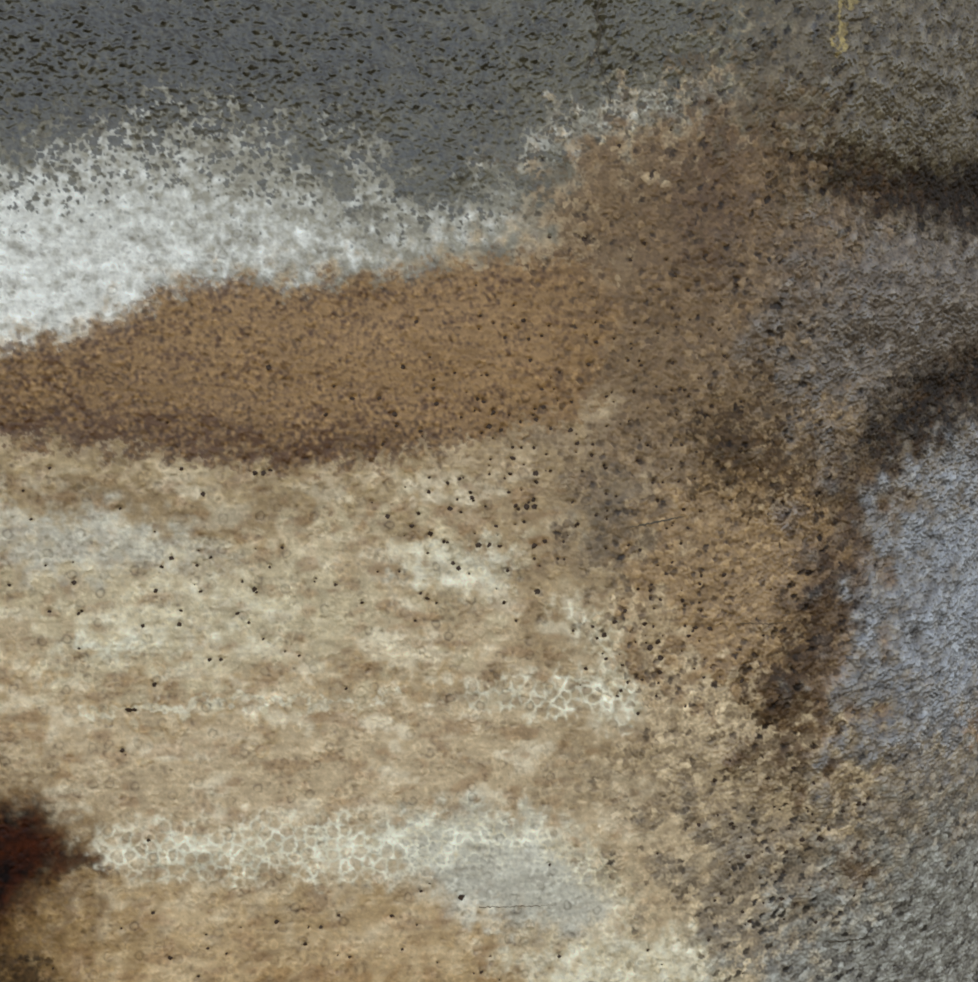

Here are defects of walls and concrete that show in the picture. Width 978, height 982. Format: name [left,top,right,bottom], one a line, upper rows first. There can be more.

water stain [768,509,799,537]
water stain [385,529,531,615]
water stain [446,451,658,739]
water stain [817,758,851,806]
corrosion [0,784,113,982]